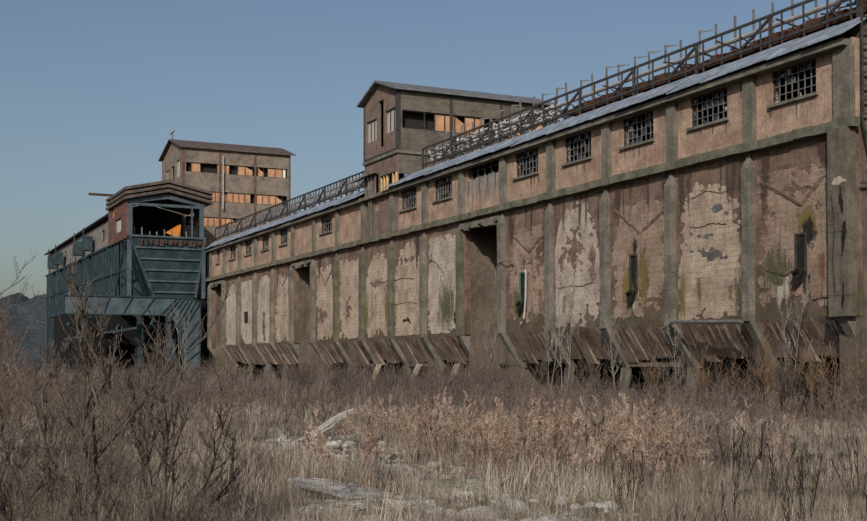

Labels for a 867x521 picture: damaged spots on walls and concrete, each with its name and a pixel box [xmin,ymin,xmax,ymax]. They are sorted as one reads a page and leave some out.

peeling [316,233,456,340]
peeling [508,224,544,323]
peeling [555,201,600,328]
peeling [612,194,664,320]
peeling [678,182,742,320]
peeling [757,162,846,308]